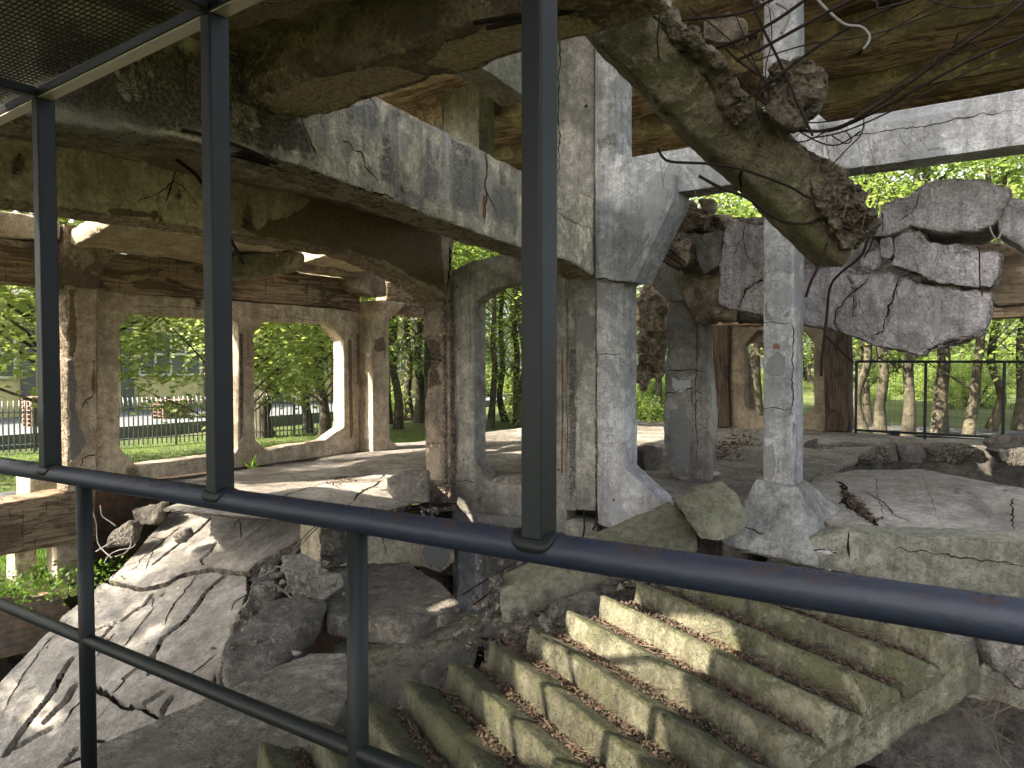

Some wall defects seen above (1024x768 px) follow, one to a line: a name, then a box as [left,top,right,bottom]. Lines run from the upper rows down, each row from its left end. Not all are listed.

spalling [557,9,603,40]
spalling [229,13,522,167]
spalling [681,0,1024,168]
spalling [657,148,820,225]
crack [833,275,898,341]
crack [924,332,981,350]
crack [96,518,270,656]
crack [814,478,942,558]
crack [896,547,1022,566]
crack [1008,498,1016,529]
crack [2,622,65,714]
crack [17,673,159,749]